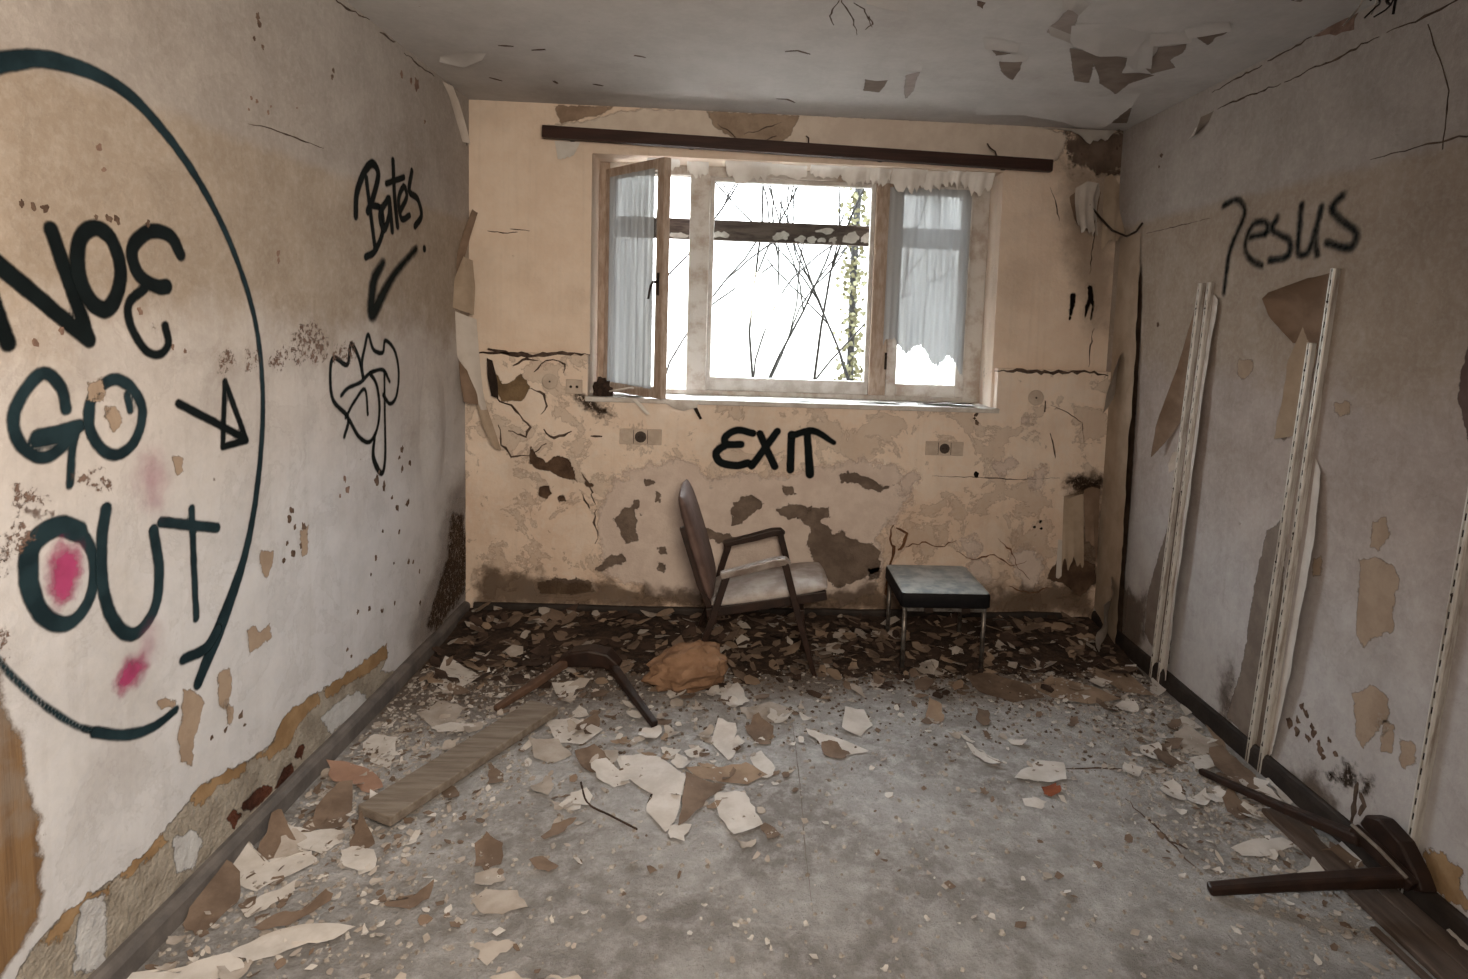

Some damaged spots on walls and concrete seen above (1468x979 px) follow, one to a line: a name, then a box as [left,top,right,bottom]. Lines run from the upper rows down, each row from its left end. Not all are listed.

crack [336,0,434,76]
peeling [859,401,979,426]
crack [581,473,599,544]
peeling [496,358,921,606]
crack [907,540,1047,593]
flaking render [1009,549,1096,597]
peeling [1356,517,1400,648]
peeling [247,623,272,652]
spalling [1286,703,1338,760]
peeling [1352,685,1416,769]
peeling [974,660,1303,875]
peeling [1423,847,1468,912]